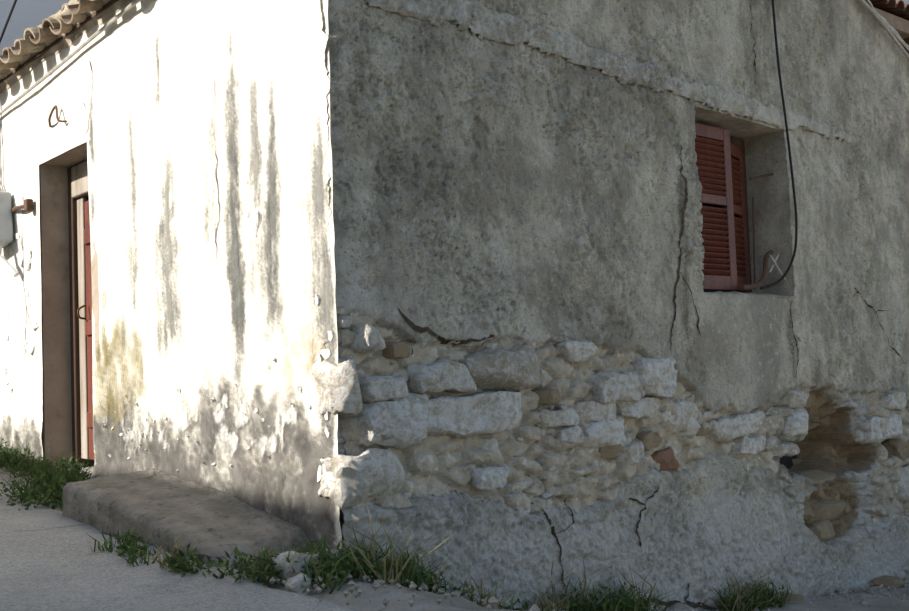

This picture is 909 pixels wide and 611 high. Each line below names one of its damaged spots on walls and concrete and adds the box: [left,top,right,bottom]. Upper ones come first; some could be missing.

damp [157,160,177,350]
damp [224,68,281,353]
damp [312,123,335,364]
crack [670,146,701,348]
damp [0,416,41,462]
peeling [102,393,198,451]
damp [93,366,335,554]
peeling [210,384,297,459]
spalling [306,306,909,541]